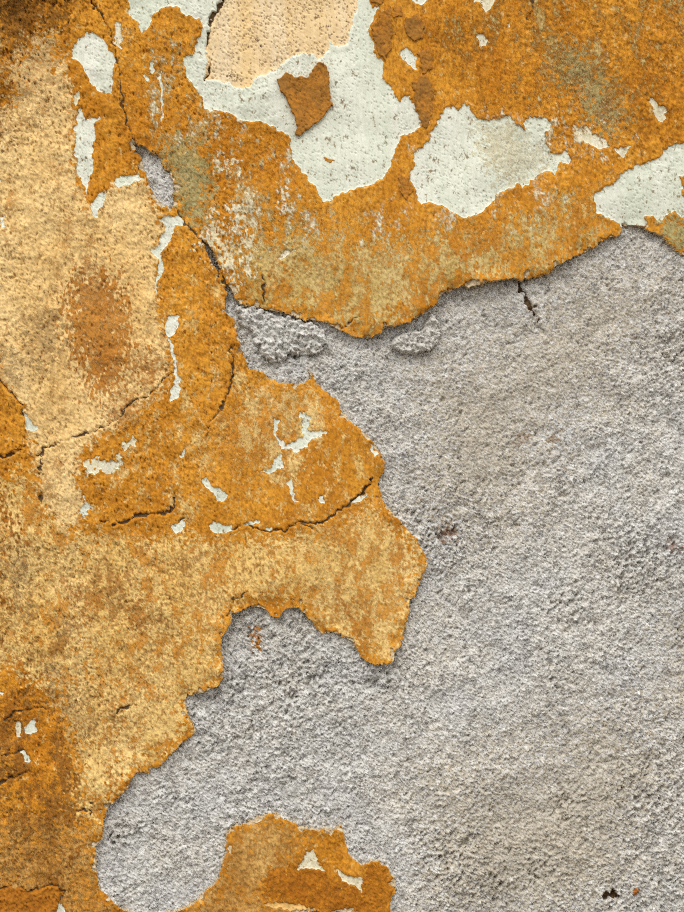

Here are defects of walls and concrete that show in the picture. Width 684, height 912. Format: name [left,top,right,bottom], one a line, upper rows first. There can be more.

peeling [71,32,116,94]
crack [90,1,133,139]
peeling [127,0,637,242]
peeling [648,98,667,122]
peeling [191,184,264,294]
peeling [274,178,319,260]
crack [518,282,539,322]
crack [208,345,235,428]
crack [0,372,174,504]
peeling [188,418,233,502]
crack [100,493,185,526]
crack [232,478,373,533]